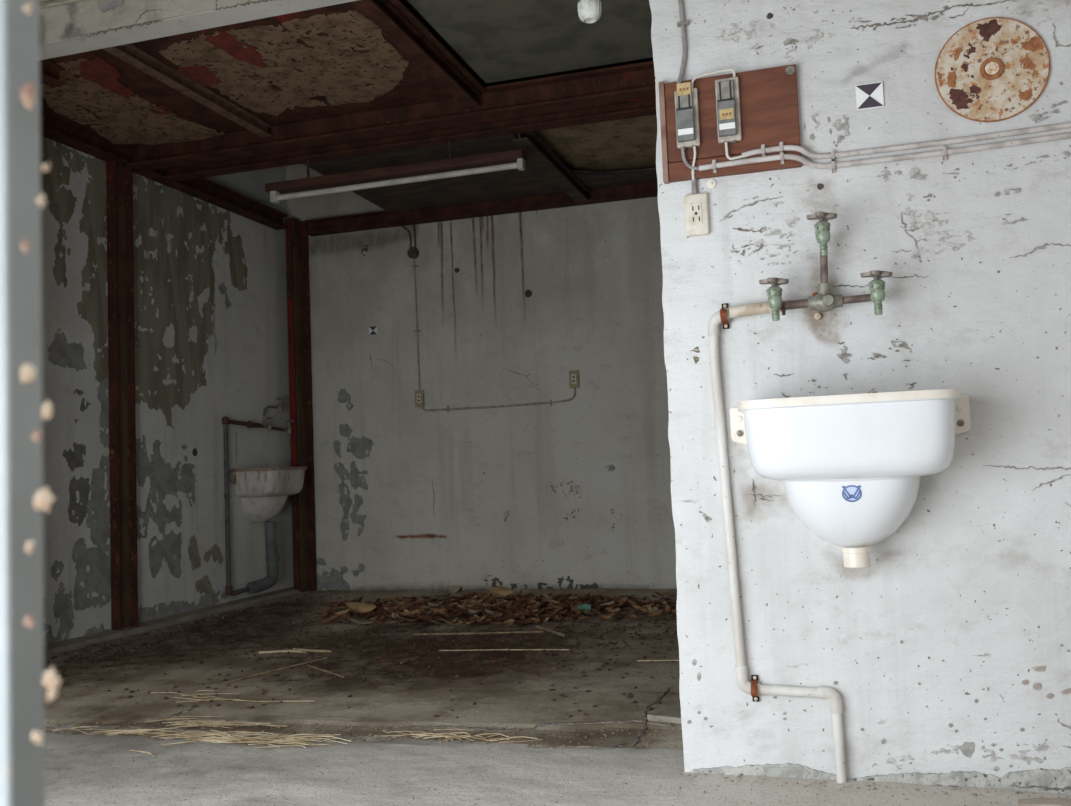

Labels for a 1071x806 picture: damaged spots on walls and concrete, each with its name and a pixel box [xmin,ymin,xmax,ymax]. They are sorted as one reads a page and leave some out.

crack [850,0,1010,29]
peeling [40,57,225,145]
peeling [159,10,409,116]
spalling [988,151,1071,174]
peeling [132,173,248,429]
peeling [40,135,111,645]
peeling [136,435,228,623]
peeling [333,389,374,541]
crack [983,465,1071,506]
spalling [483,575,553,590]
crack [410,688,677,747]